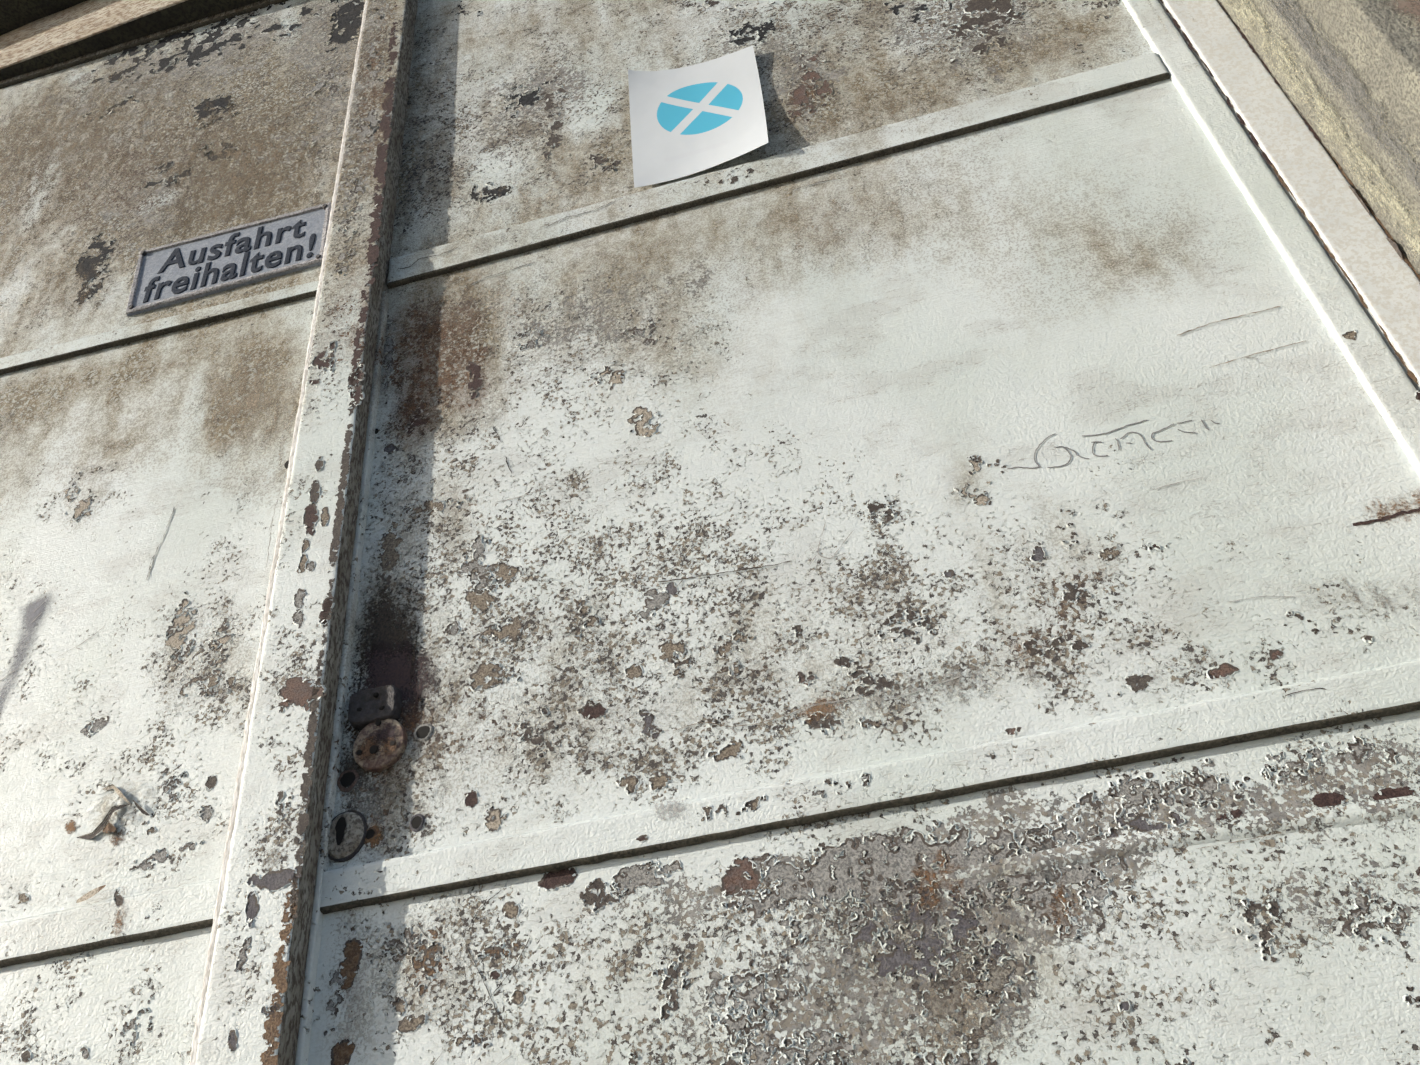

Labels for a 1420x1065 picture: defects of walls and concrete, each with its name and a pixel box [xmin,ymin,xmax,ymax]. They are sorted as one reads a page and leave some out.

peeling [883,0,1026,56]
water stain [0,60,333,249]
peeling [77,0,384,277]
corrosion [260,2,398,1065]
peeling [164,591,236,698]
peeling [443,534,524,643]
peeling [638,582,690,680]
peeling [128,774,217,872]
peeling [463,789,508,833]
peeling [538,860,683,914]
peeling [651,734,1399,1065]
peeling [1337,877,1411,949]